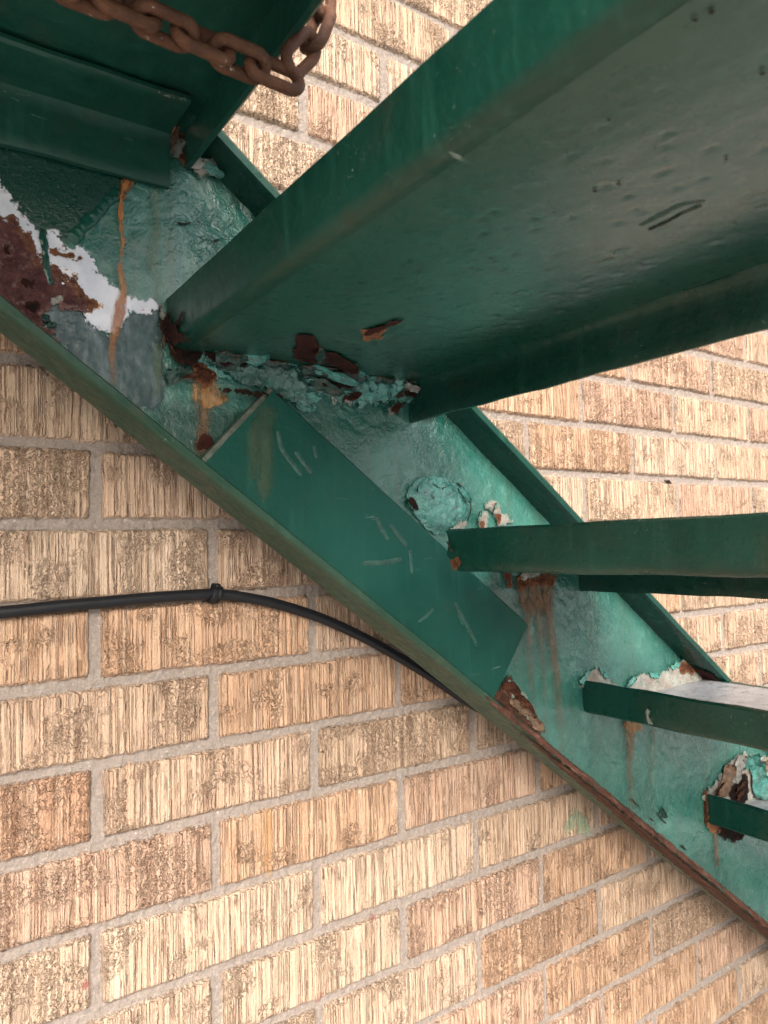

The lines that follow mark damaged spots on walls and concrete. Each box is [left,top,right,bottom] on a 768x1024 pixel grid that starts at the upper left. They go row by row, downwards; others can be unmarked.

rust [0,218,99,343]
rust [111,179,134,340]
peeling [0,179,420,416]
rust [360,328,387,342]
rust [164,362,228,453]
rust [504,573,558,678]
peeling [579,660,702,692]
rust [485,676,768,939]
spalling [717,827,745,843]
peeling [715,753,768,803]